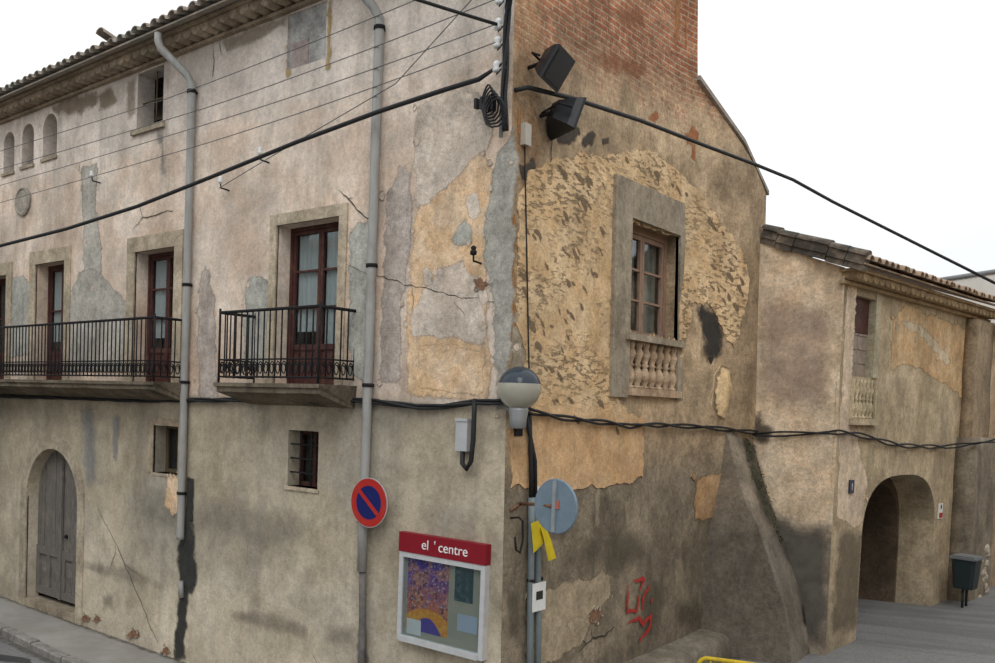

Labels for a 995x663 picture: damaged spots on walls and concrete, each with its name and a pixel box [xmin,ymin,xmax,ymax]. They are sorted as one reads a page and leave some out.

peeling [346,221,368,380]
crack [351,266,494,312]
peeling [376,89,750,490]
water stain [698,305,723,363]
peeling [690,473,721,520]
crack [97,506,157,640]
peeling [525,569,613,663]
crack [578,627,614,653]